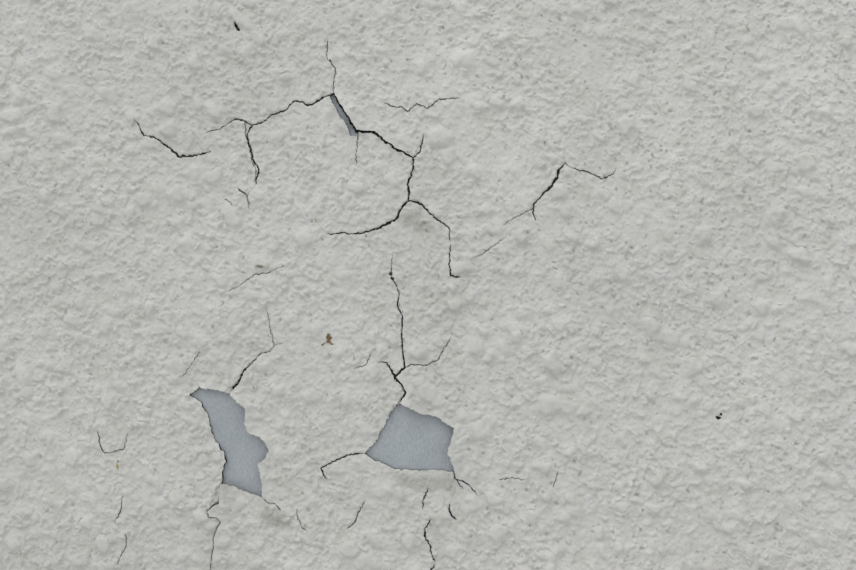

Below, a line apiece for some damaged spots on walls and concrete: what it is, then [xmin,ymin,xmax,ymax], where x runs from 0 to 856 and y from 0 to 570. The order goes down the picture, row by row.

crack [134,41,459,278]
crack [472,164,616,258]
crack [232,312,282,390]
crack [356,255,450,402]
peeling [365,291,515,496]
crack [207,503,221,570]
peeling [191,342,332,564]
crack [320,453,363,476]
crack [422,489,435,570]
crack [448,473,477,519]